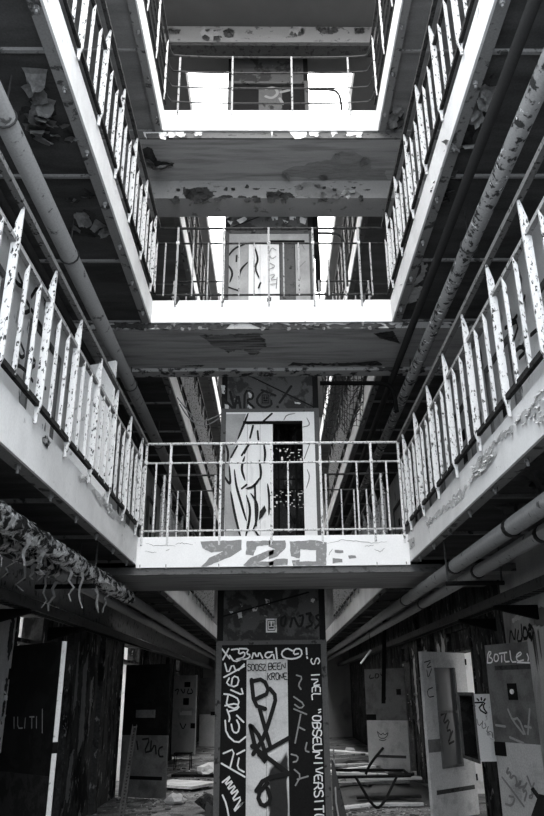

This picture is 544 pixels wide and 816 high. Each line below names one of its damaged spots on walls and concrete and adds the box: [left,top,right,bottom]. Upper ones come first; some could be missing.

peeling [289,26,305,37]
peeling [316,25,338,34]
peeling [19,67,79,146]
peeling [442,74,496,152]
peeling [139,132,202,172]
peeling [169,182,371,204]
peeling [442,170,464,203]
peeling [407,262,428,306]
peeling [114,319,400,355]
peeling [425,387,544,528]